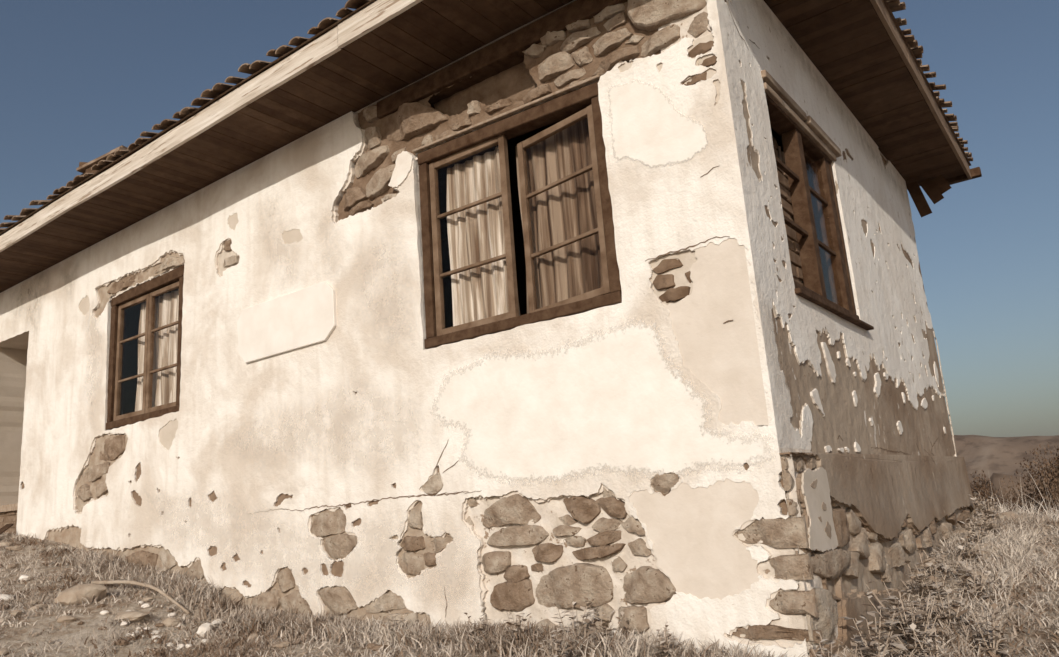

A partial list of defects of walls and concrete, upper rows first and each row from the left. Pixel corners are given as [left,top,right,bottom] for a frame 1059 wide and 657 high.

spalling [334,0,721,223]
peeling [740,79,765,182]
flaking render [79,250,185,319]
peeling [646,236,769,426]
peeling [861,207,928,307]
spalling [45,433,432,629]
crack [247,490,482,515]
flaking render [391,441,459,579]
spalling [463,301,974,650]